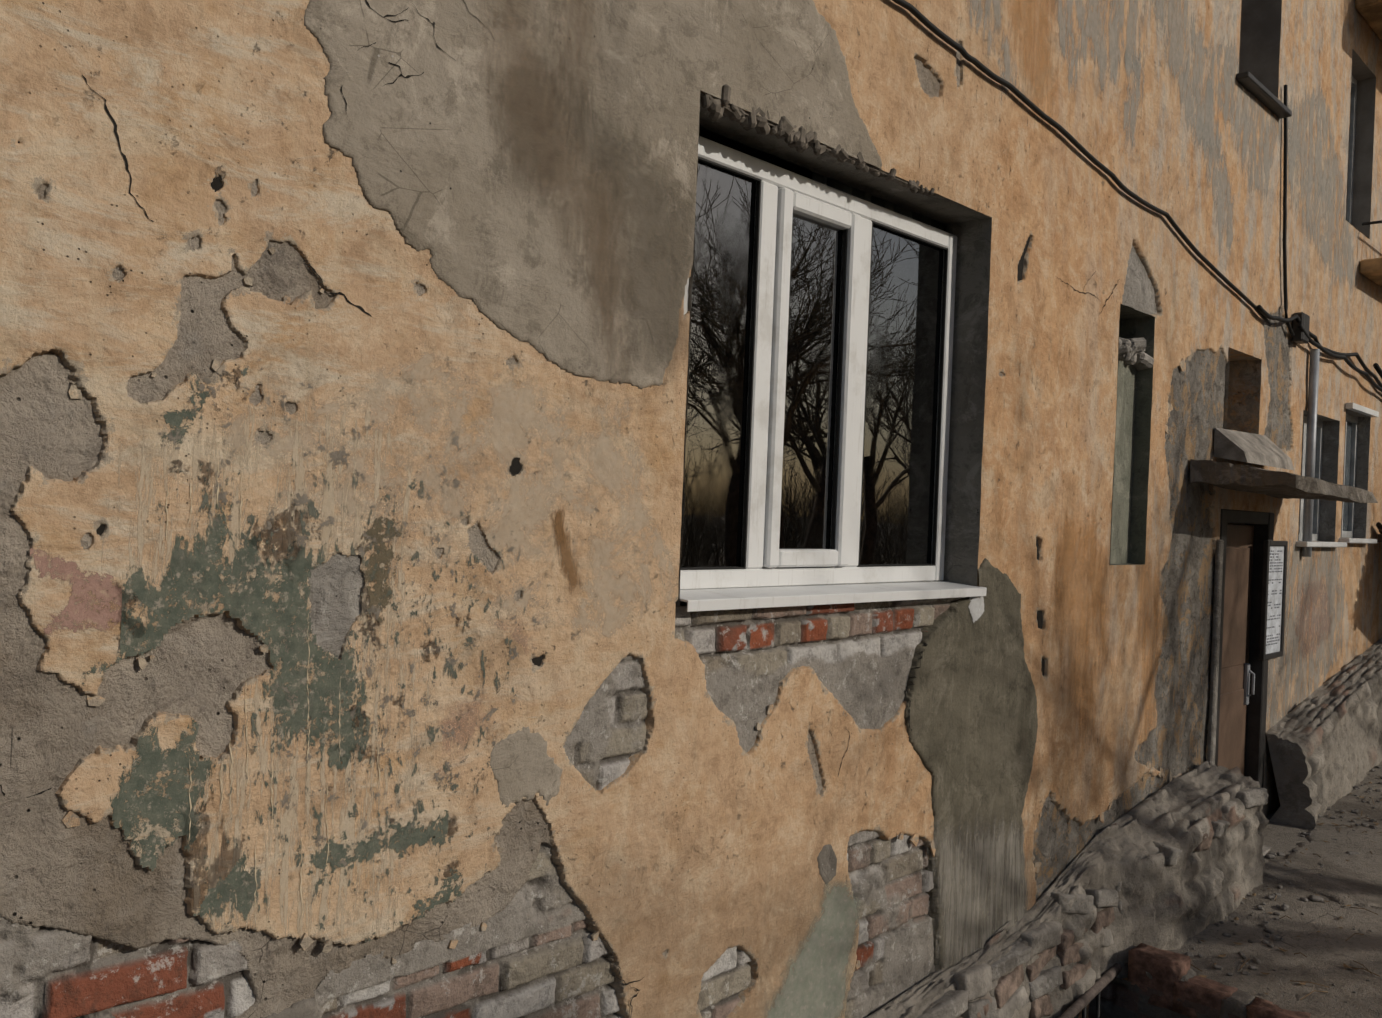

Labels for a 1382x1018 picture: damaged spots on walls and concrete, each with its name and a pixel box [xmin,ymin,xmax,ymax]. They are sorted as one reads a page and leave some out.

crack [357,0,456,85]
crack [82,75,154,222]
spalling [211,176,226,225]
spalling [701,84,936,197]
flaking render [0,241,622,1018]
spalling [563,655,648,790]
flaking render [675,597,966,752]
spalling [697,946,752,1018]
flaking render [845,830,936,1018]